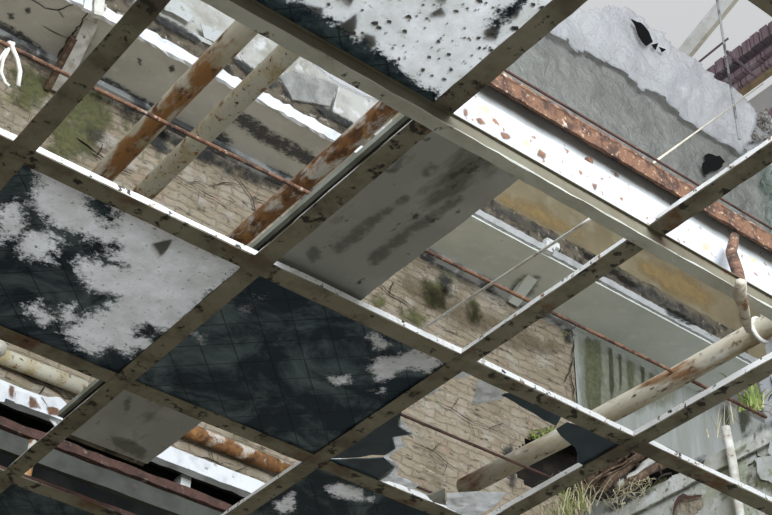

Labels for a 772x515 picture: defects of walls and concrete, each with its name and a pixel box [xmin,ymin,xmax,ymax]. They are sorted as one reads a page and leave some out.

flaking render [754,437,772,483]